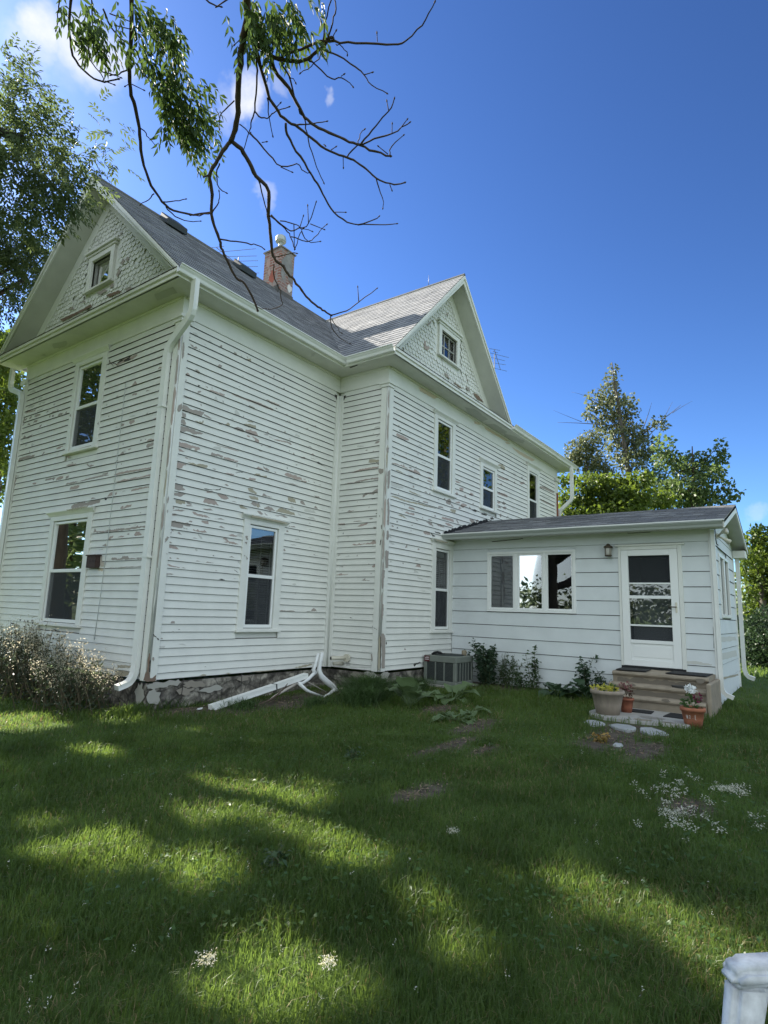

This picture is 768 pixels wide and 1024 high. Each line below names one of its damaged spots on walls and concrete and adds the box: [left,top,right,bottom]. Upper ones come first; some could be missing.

peeling [32,439,154,511]
peeling [93,525,145,546]
peeling [157,339,320,575]
peeling [341,392,479,620]